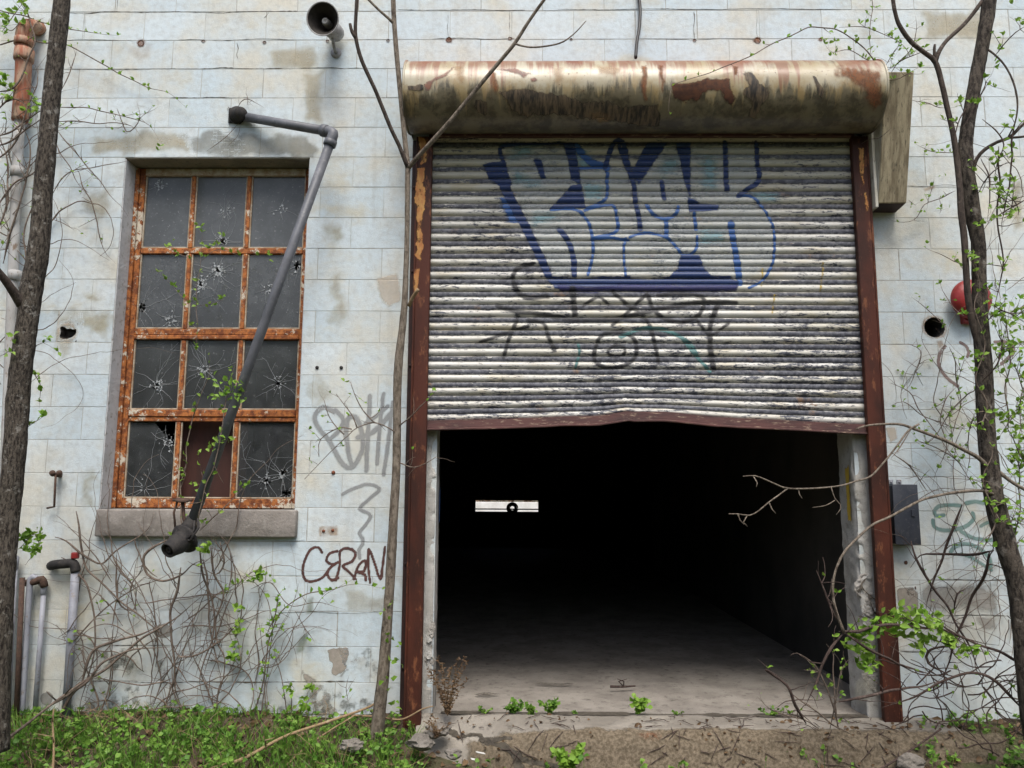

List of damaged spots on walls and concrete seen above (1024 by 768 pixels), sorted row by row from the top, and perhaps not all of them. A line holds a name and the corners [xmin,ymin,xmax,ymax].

rust [642,65,664,100]
rust [836,68,880,108]
peeling [328,647,356,676]